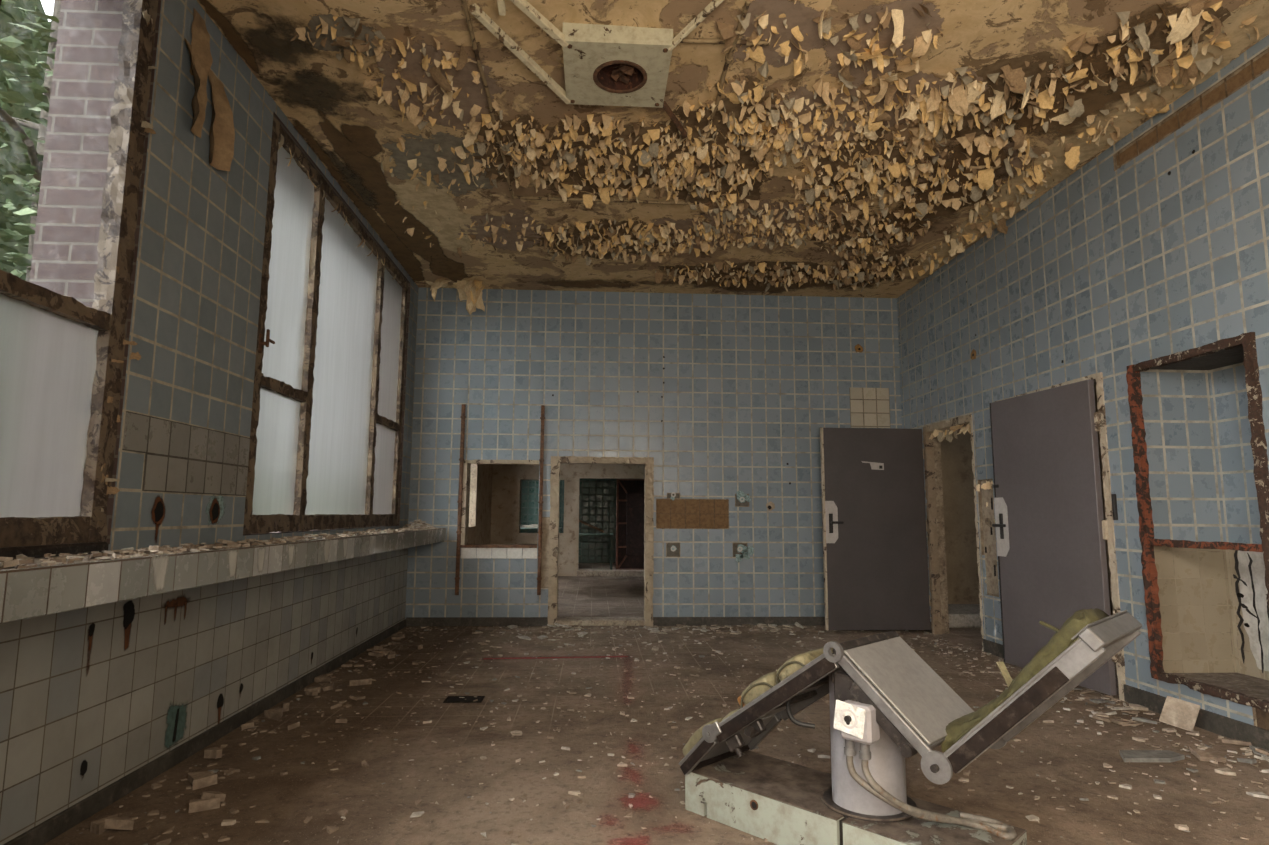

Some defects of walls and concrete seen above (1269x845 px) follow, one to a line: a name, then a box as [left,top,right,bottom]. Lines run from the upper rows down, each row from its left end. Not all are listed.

peeling [184,8,235,171]
peeling [290,0,1269,293]
corrosion [162,595,189,625]
crack [1233,550,1269,673]